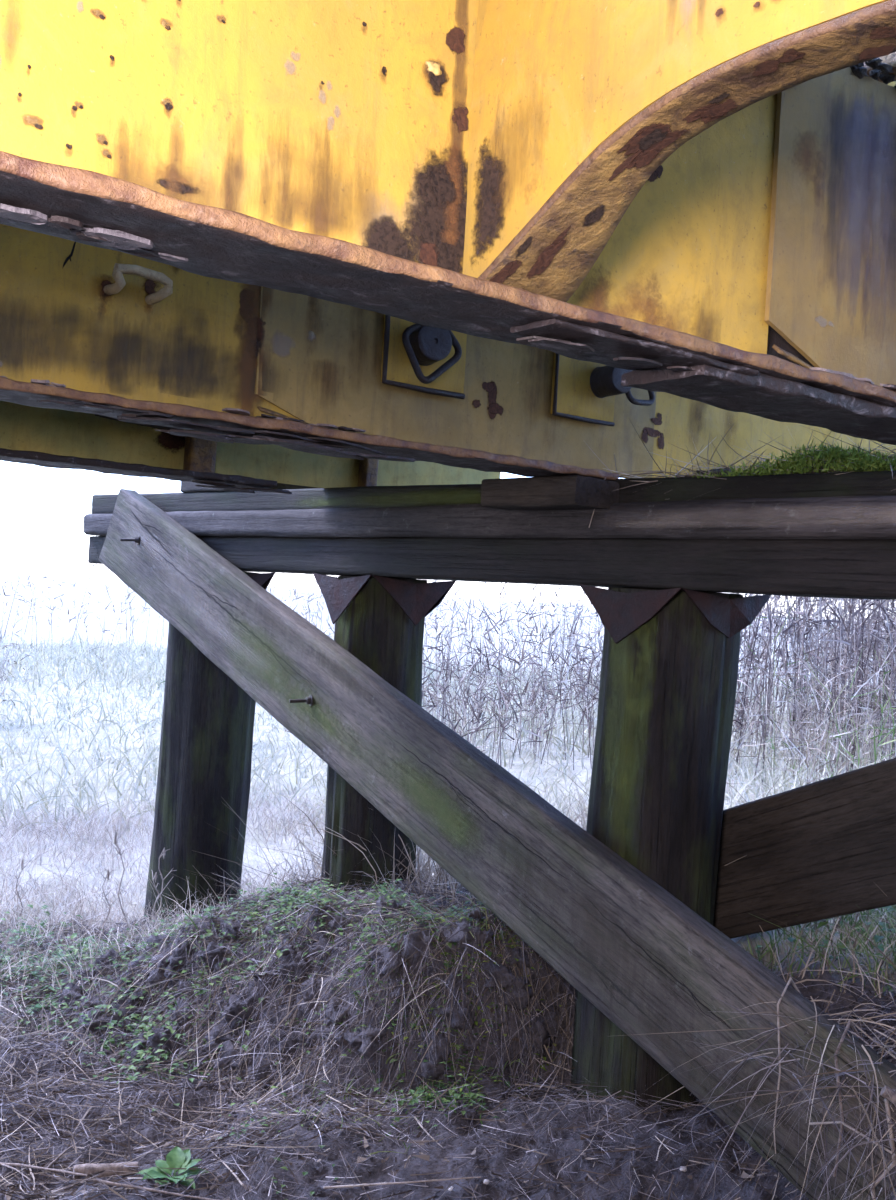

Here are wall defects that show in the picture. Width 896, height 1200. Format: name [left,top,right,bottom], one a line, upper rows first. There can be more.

corrosion [751,48,806,78]
corrosion [857,27,896,60]
corrosion [608,91,737,182]
corrosion [363,139,504,274]
corrosion [489,204,605,289]
leakage [846,117,896,269]
corrosion [472,381,503,419]
corrosion [642,413,664,449]